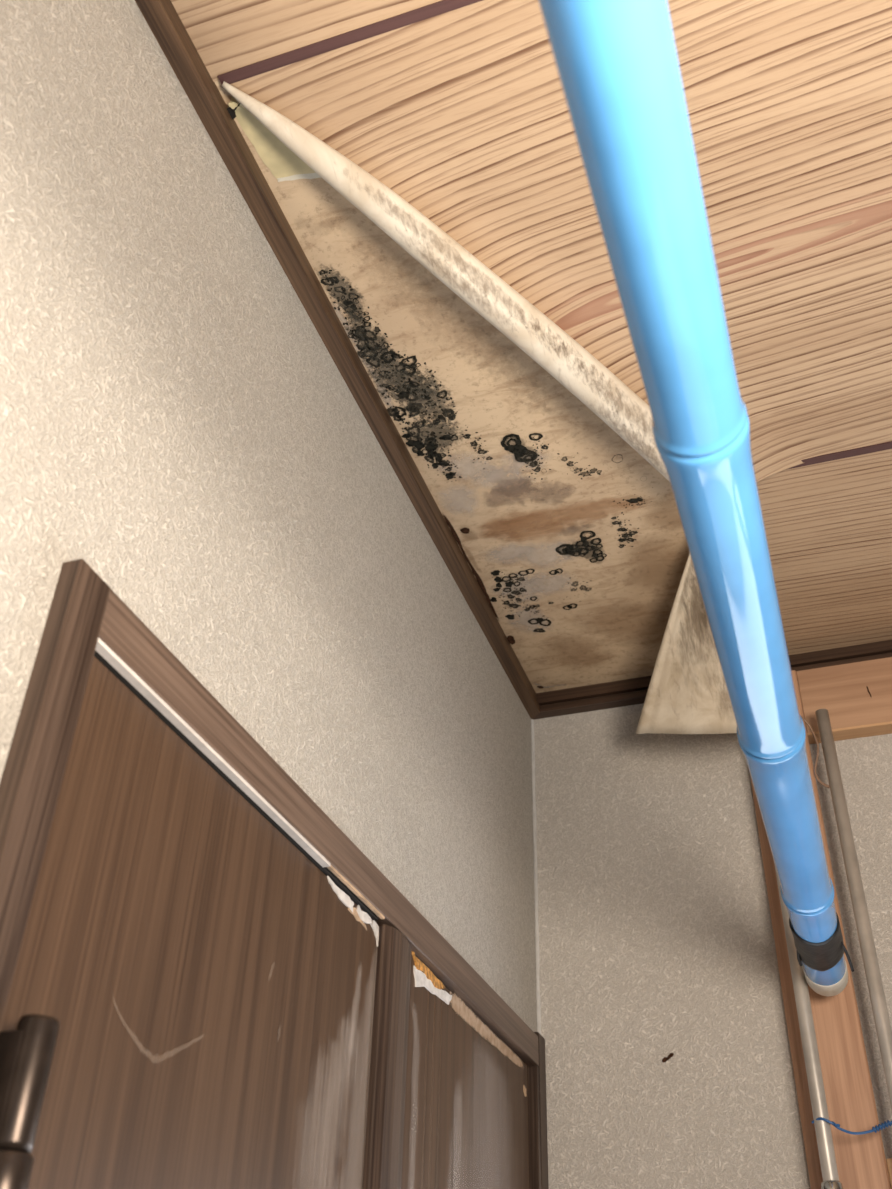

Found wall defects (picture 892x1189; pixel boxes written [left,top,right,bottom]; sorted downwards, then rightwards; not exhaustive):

peeling [222,81,670,482]
damp [319,268,653,633]
peeling [636,553,737,734]